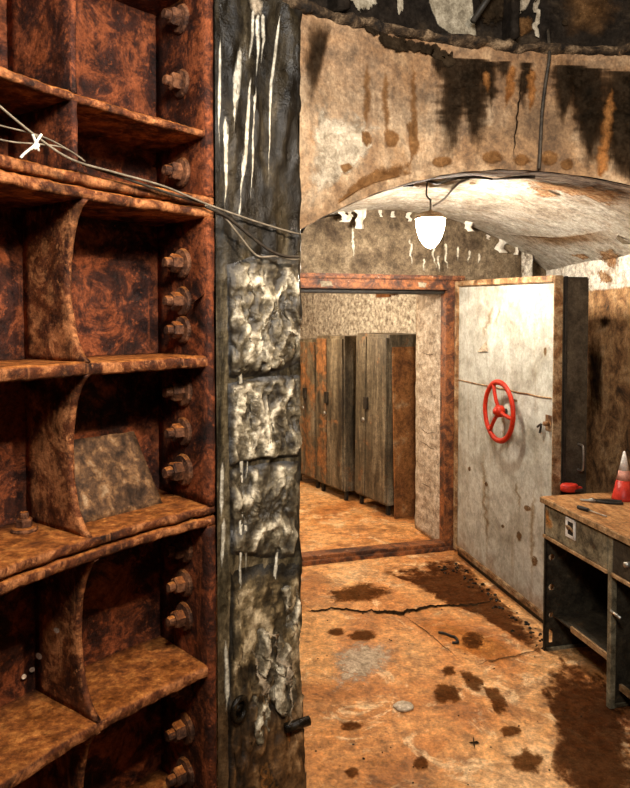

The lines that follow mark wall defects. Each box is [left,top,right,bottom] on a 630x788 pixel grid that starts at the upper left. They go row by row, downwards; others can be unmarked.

flaking render [350,0,377,11]
flaking render [429,0,476,36]
flaking render [519,0,540,37]
water stain [218,0,265,214]
water stain [268,18,280,167]
water stain [433,57,508,138]
water stain [610,71,630,169]
water stain [332,584,383,601]
crack [308,600,491,659]
water stain [388,561,539,651]
water stain [511,749,543,771]
water stain [542,659,630,788]